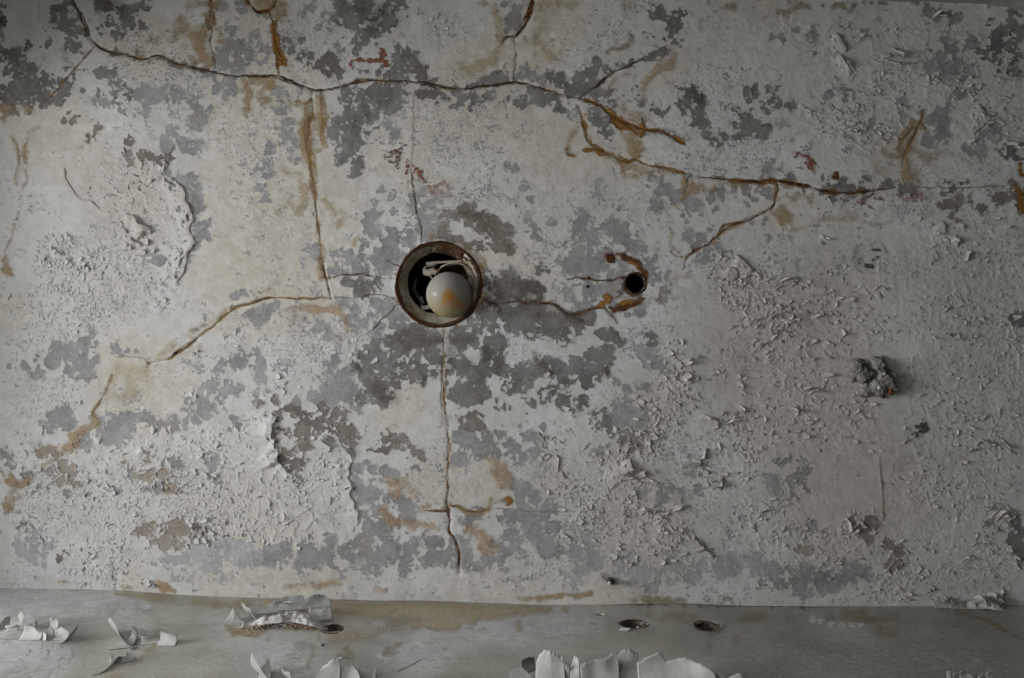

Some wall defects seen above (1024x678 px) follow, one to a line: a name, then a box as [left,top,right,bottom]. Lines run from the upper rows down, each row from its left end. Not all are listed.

flaking render [0,36,214,289]
flaking render [48,0,271,101]
leakage [174,1,224,68]
leakage [296,95,329,216]
crack [40,0,1002,419]
corrosion [606,108,646,138]
flaking render [238,0,1024,204]
corrosion [595,248,648,313]
flaking render [0,157,1024,610]
crack [424,336,558,573]
crack [877,459,885,521]